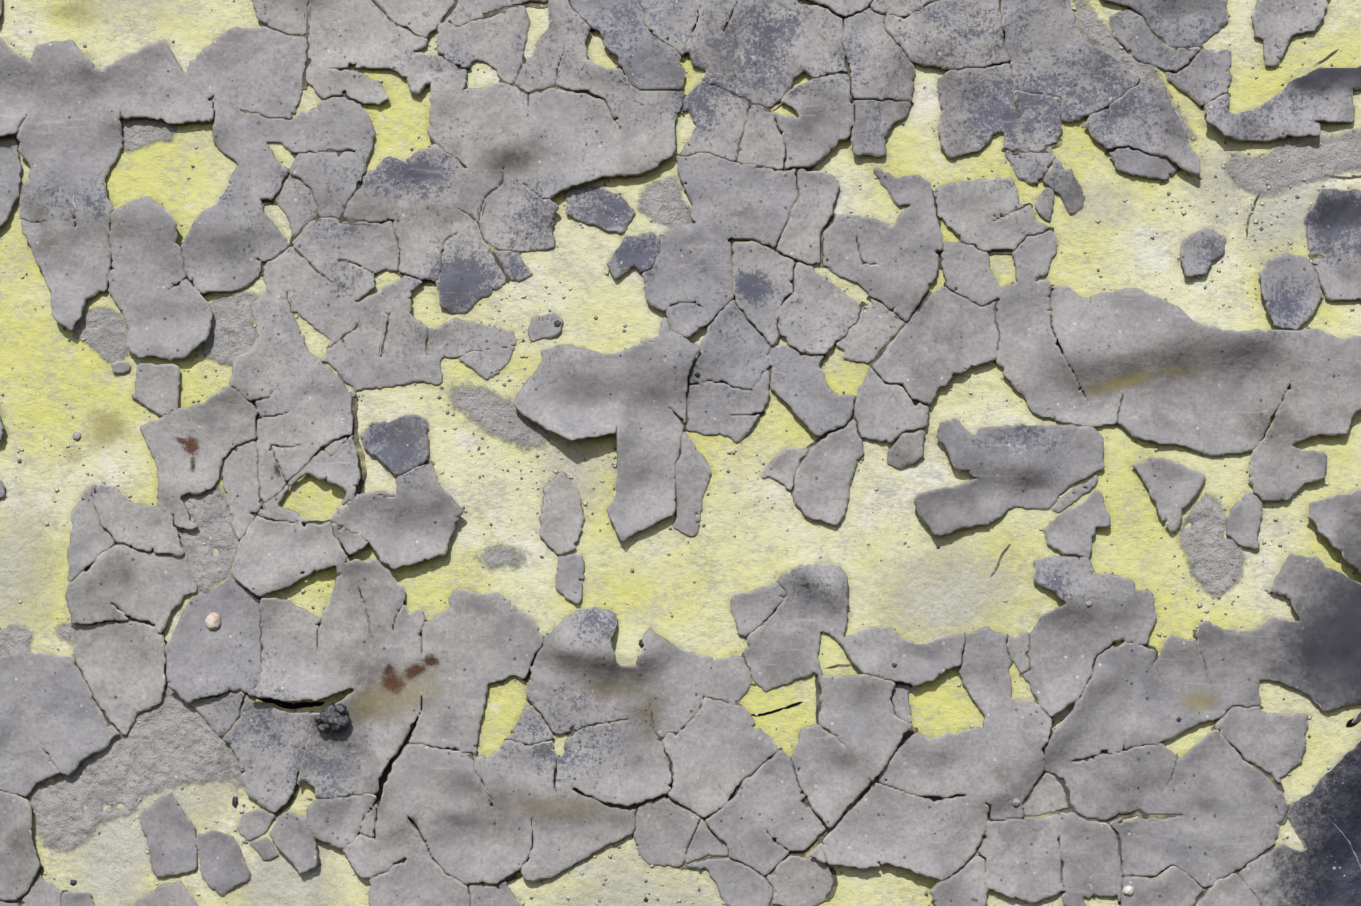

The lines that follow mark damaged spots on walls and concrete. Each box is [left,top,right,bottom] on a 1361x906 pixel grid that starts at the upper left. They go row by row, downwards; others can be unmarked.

crack [257,150,552,313]
peeling [251,0,1361,450]
crack [643,0,1054,495]
corrosion [178,438,199,470]
crack [71,604,325,738]
crack [313,397,435,494]
crack [274,698,533,895]
corrosion [383,656,438,693]
peeling [0,0,826,906]
crack [504,581,918,906]
peeling [279,230,1361,906]
crack [921,634,1182,905]